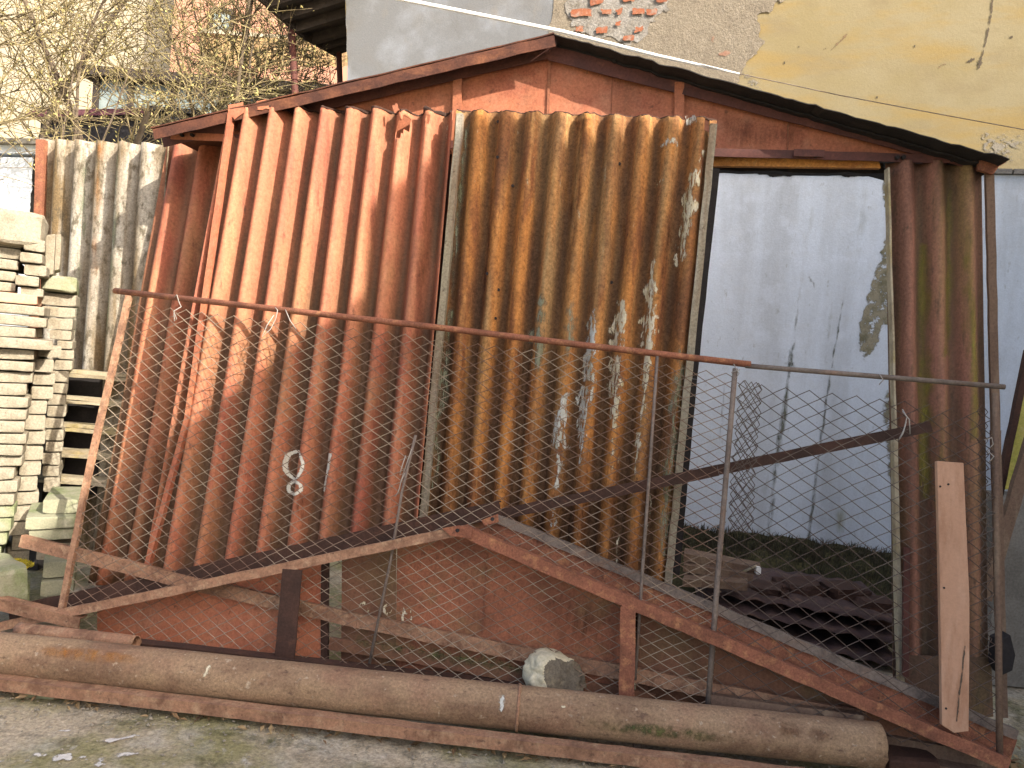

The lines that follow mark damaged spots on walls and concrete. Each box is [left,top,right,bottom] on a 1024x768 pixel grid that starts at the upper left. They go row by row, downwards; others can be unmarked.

flaking render [345,0,786,88]
peeling [673,150,704,267]
peeling [859,240,887,357]
peeling [551,259,659,489]
damp [777,347,793,452]